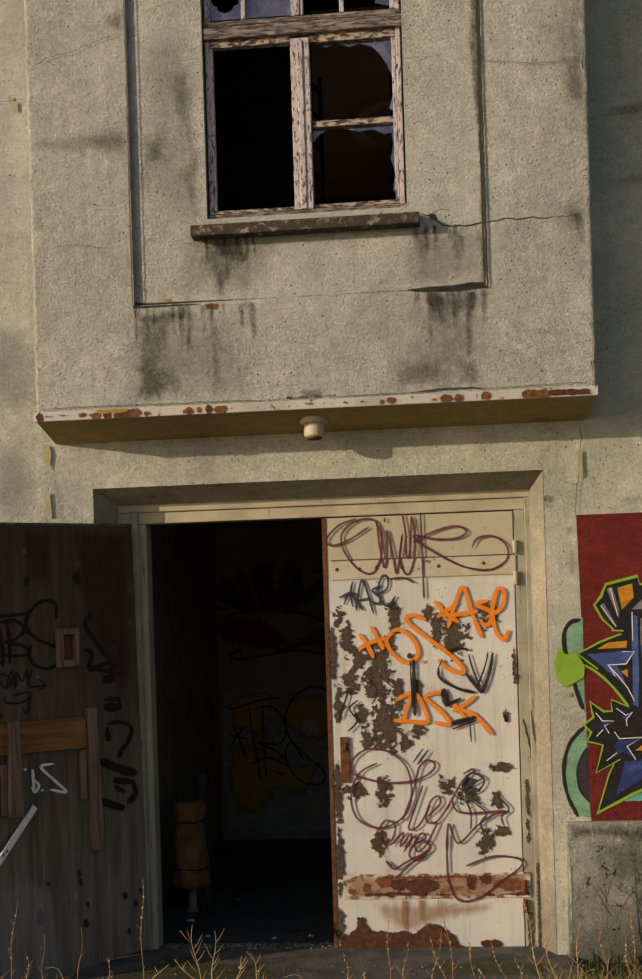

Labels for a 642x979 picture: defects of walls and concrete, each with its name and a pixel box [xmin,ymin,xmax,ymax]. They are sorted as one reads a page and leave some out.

leakage [407,0,489,347]
crack [419,209,581,227]
corrosion [431,394,463,402]
corrosion [522,388,591,399]
corrosion [78,408,150,419]
corrosion [183,405,227,414]
crack [558,424,593,515]